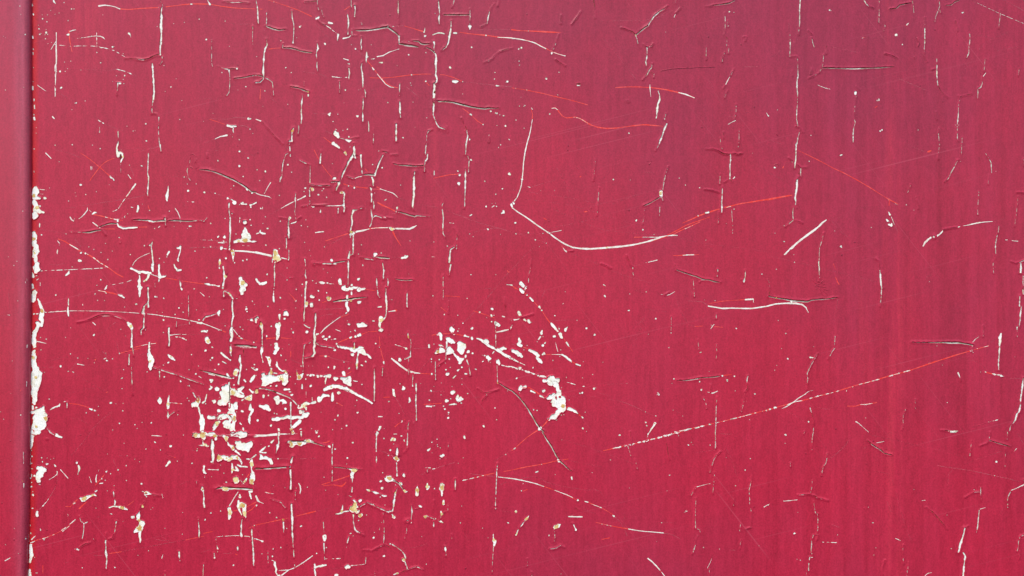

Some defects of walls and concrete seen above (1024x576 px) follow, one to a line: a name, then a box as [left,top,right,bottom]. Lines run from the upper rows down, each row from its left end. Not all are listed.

peeling [30,185,63,438]
peeling [218,196,267,270]
peeling [146,275,403,521]
crack [68,0,502,576]
peeling [425,310,584,427]
crack [466,364,574,512]
crack [619,0,746,235]
crack [669,0,1024,576]